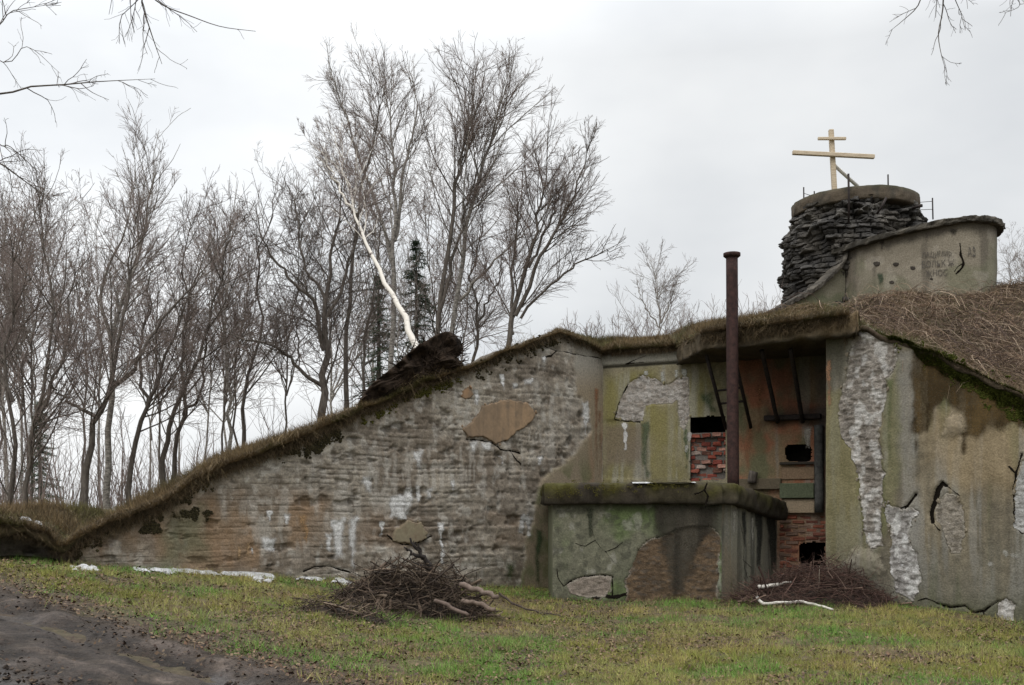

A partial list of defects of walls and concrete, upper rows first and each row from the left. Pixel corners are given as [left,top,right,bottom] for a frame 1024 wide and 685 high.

crack [954,243,965,274]
spalling [613,374,691,430]
leakage [910,347,1022,453]
crack [466,439,521,465]
spalling [838,323,922,601]
leakage [326,517,359,565]
crack [556,524,627,600]
spalling [567,528,721,602]
spalling [935,493,968,554]
spalling [1012,461,1024,533]
crack [918,597,998,616]
spalling [997,599,1016,621]